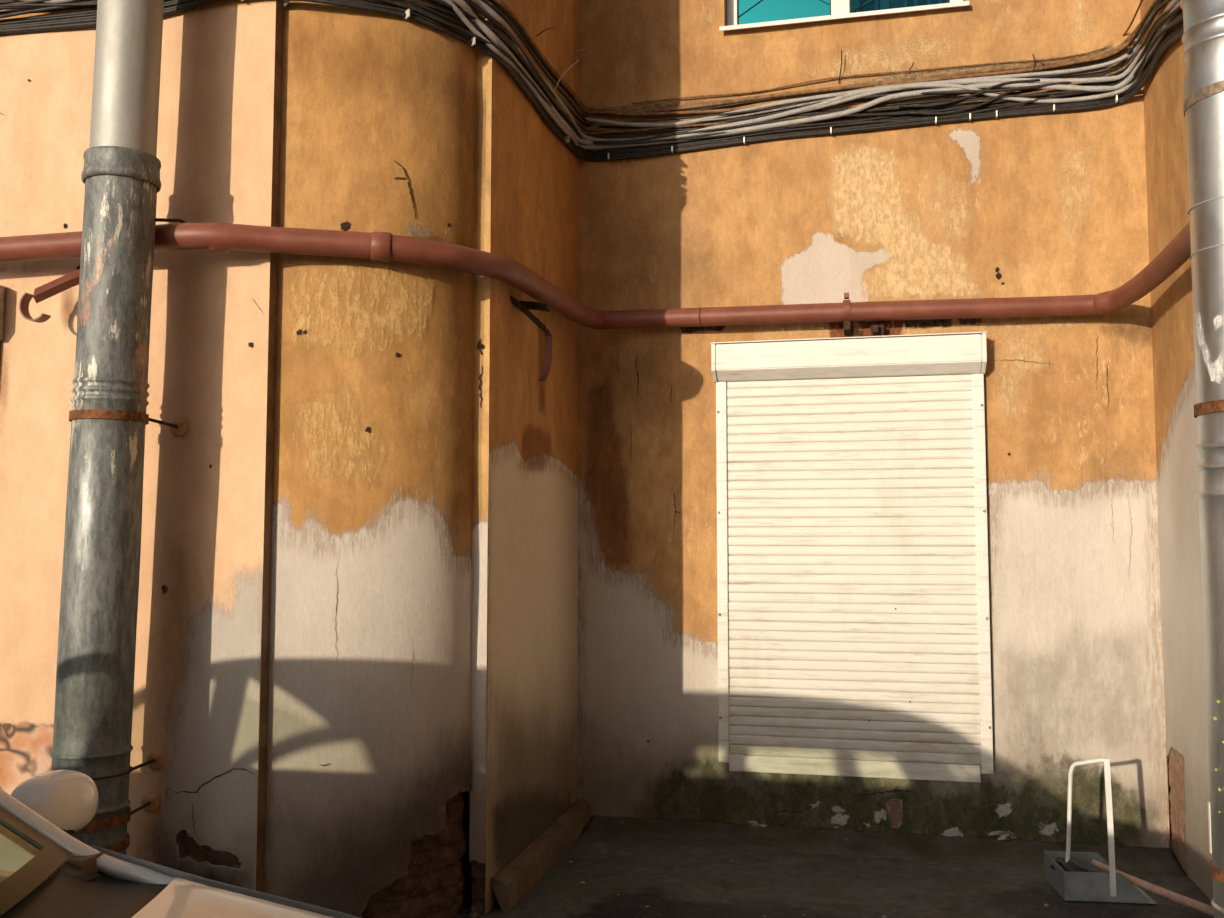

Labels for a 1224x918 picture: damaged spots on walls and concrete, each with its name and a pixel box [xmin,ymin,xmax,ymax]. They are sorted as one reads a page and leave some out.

peeling [780,146,978,305]
peeling [949,128,981,185]
peeling [158,357,1213,918]
crack [166,768,253,838]